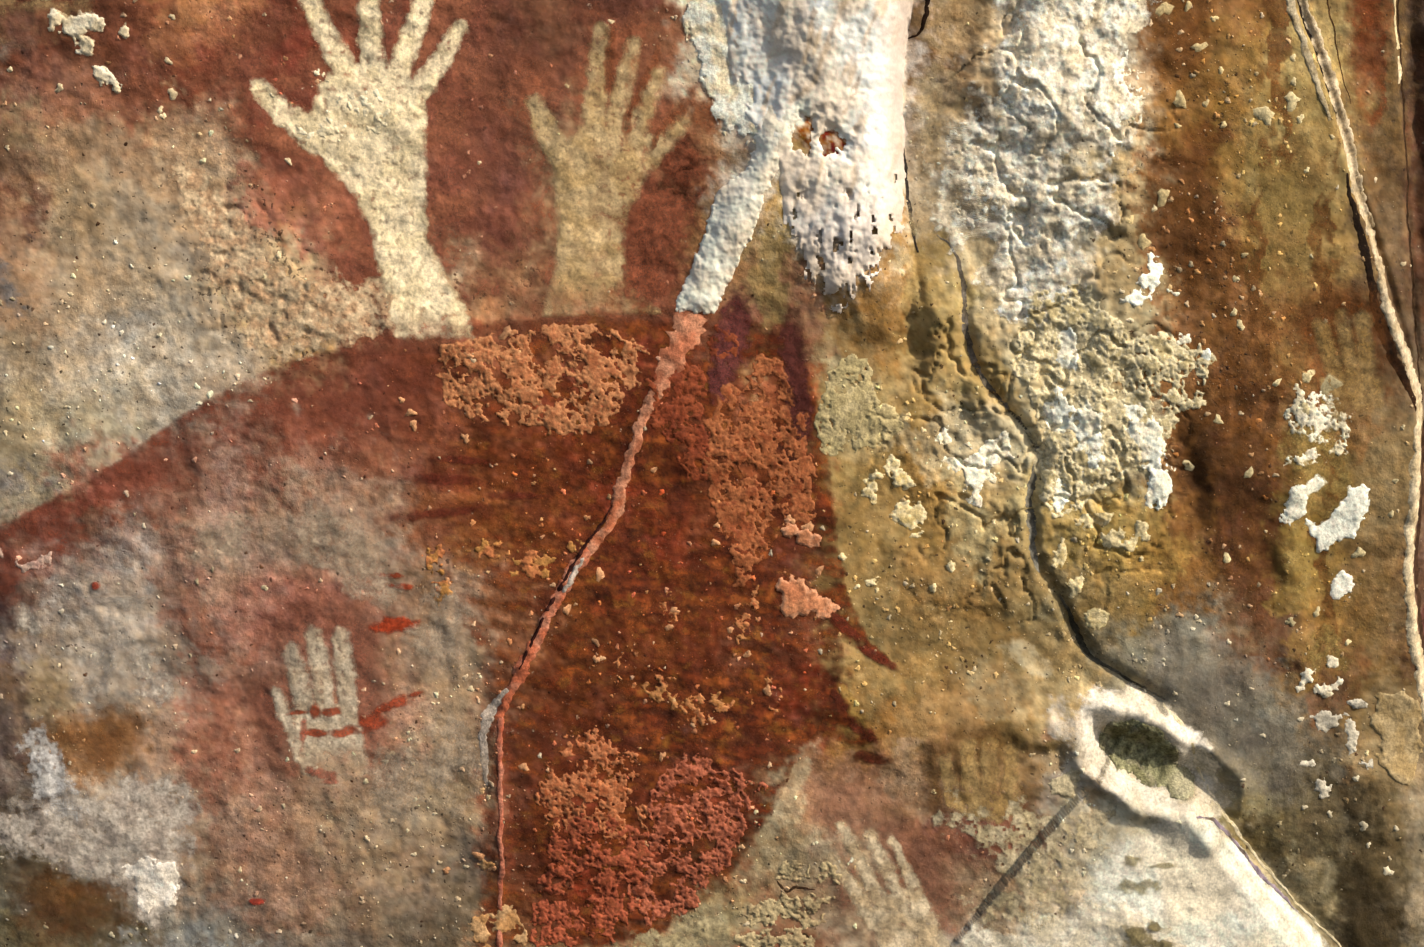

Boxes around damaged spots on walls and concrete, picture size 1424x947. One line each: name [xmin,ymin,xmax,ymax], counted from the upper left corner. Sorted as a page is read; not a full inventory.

crack [908,0,930,39]
leakage [912,0,1148,327]
crack [478,307,709,947]
peeling [418,728,790,947]
peeling [591,637,797,732]
peeling [391,0,1324,670]
peeling [1047,768,1081,801]
leakage [1023,312,1169,484]
crack [903,148,1342,947]
leakage [1280,414,1352,528]
crack [1286,0,1424,722]